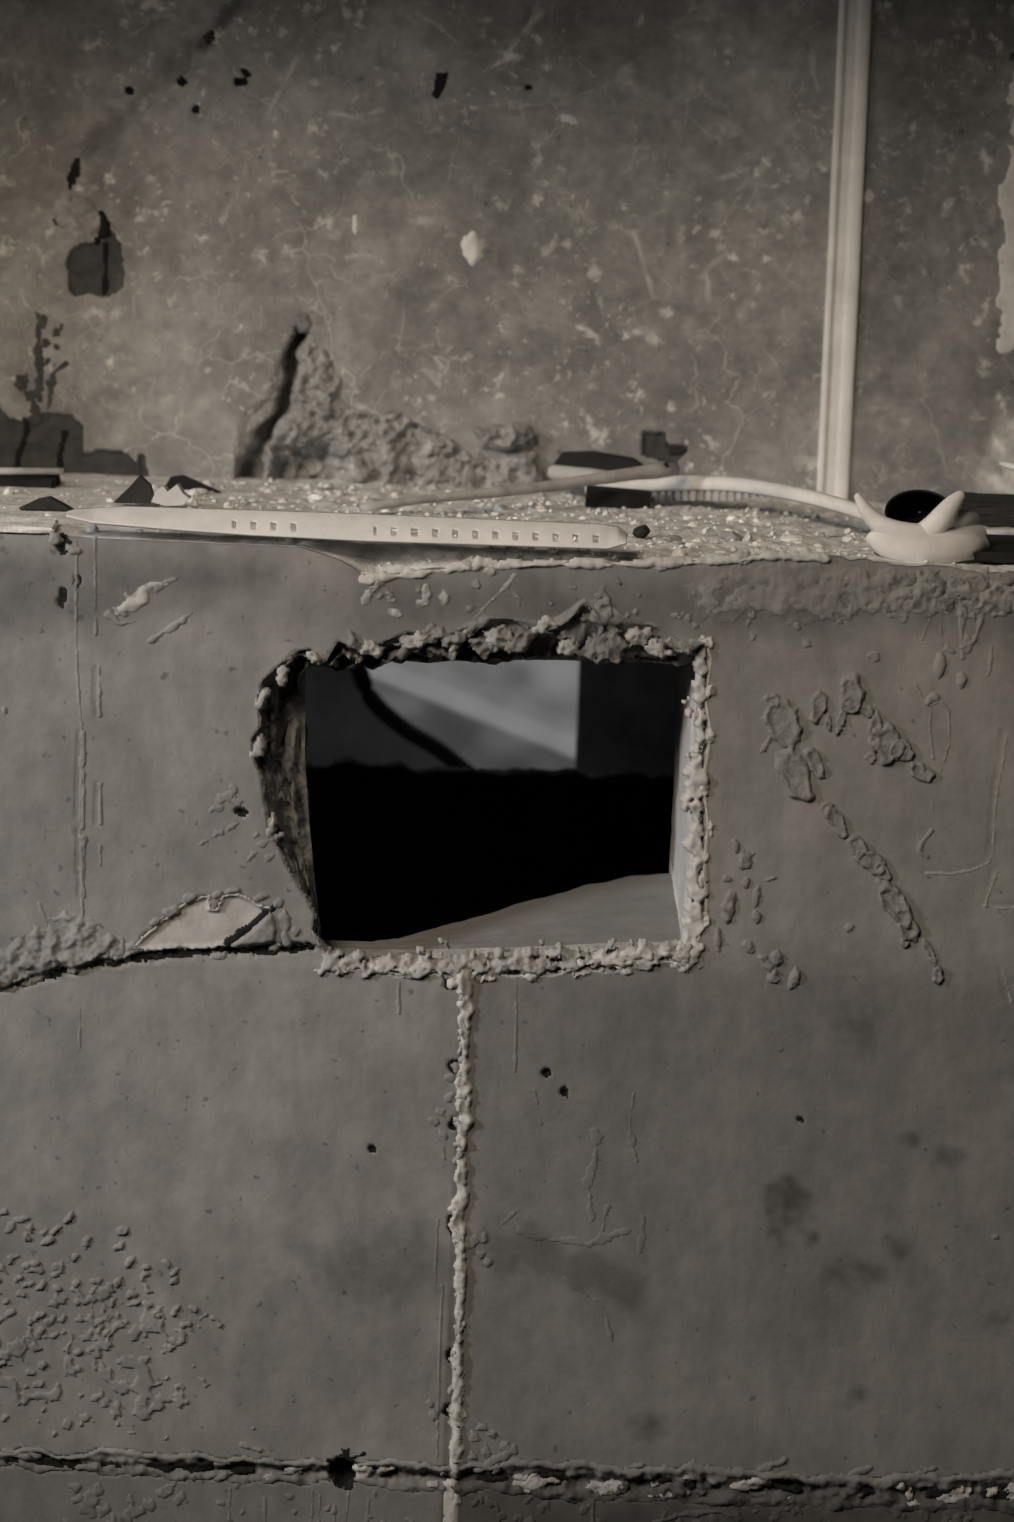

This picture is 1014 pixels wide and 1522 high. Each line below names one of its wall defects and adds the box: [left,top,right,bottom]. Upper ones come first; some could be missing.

peeling [51,144,125,298]
peeling [0,312,149,476]
spalling [233,311,549,489]
peeling [166,475,221,493]
spalling [99,547,831,990]